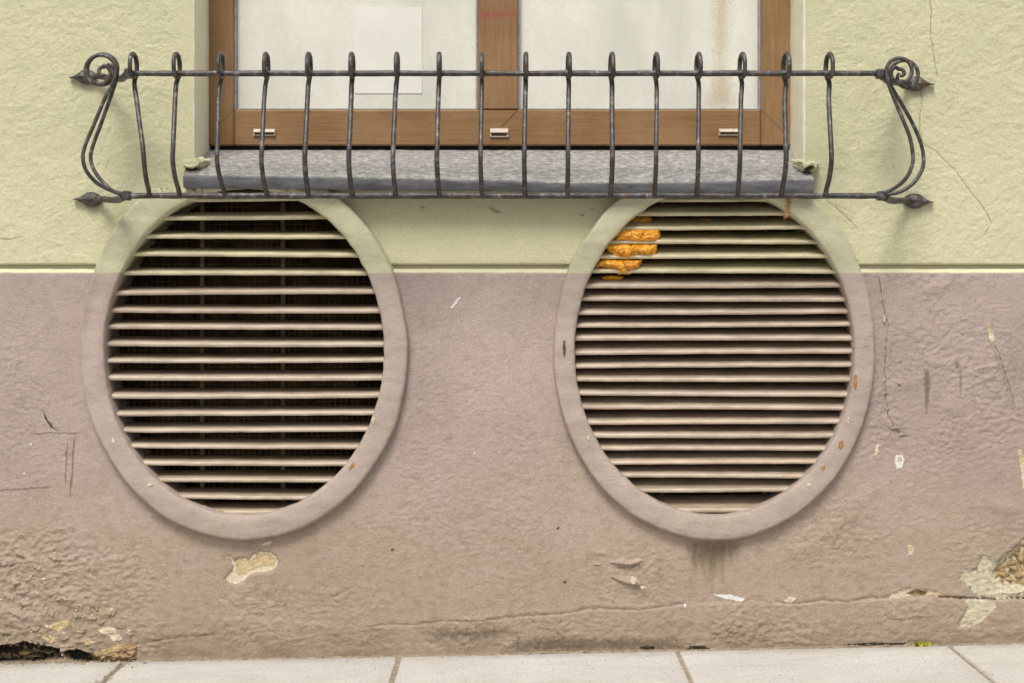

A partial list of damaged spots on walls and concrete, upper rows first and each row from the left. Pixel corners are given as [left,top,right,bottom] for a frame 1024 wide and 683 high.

peeling [0,548,138,662]
peeling [226,541,278,584]
spalling [958,539,1024,628]